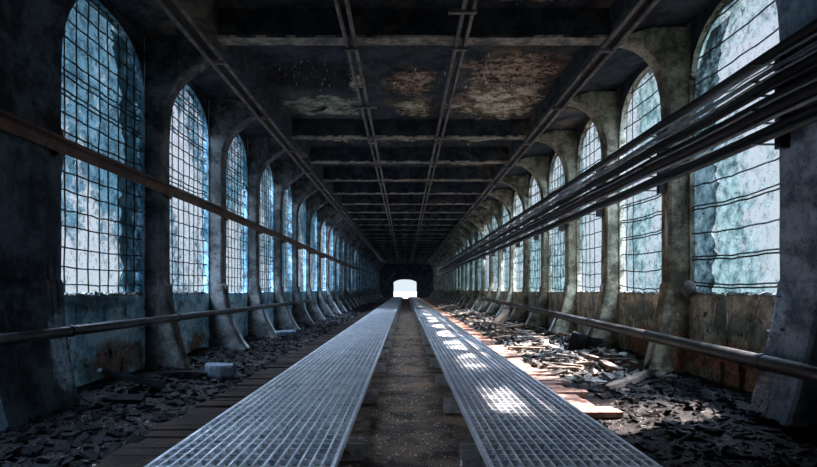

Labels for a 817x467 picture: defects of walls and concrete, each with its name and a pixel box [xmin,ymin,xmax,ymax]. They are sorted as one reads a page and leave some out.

spalling [381,63,450,117]
peeling [445,46,573,121]